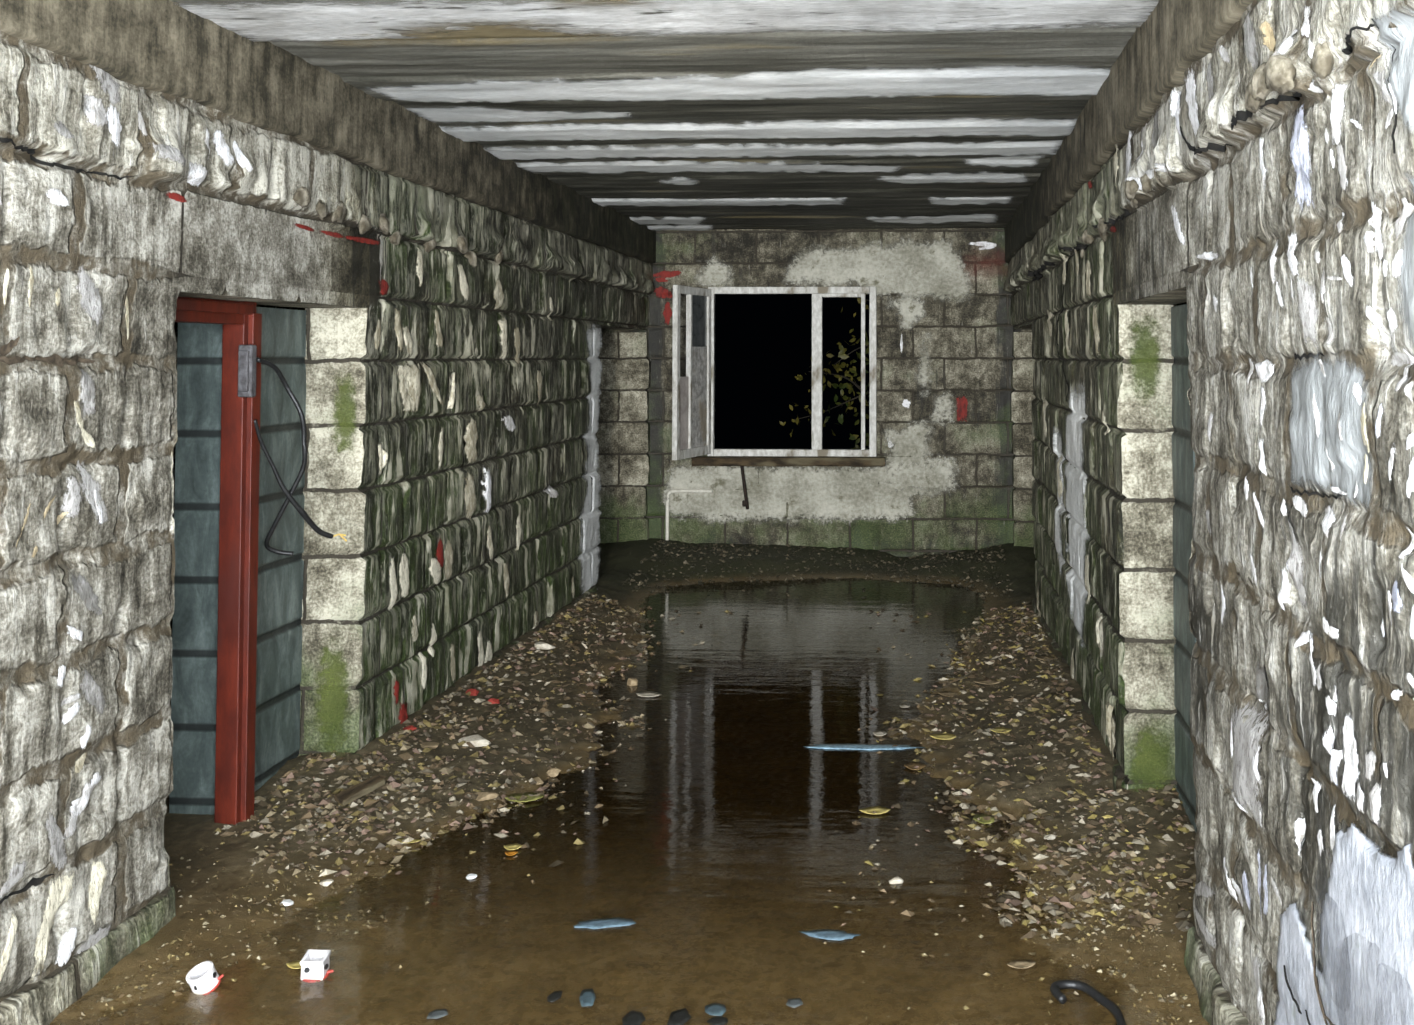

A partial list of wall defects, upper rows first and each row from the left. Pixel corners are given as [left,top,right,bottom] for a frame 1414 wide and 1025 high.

flaking render [653,270,681,325]
flaking render [956,396,968,422]
crack [1283,902,1335,1025]